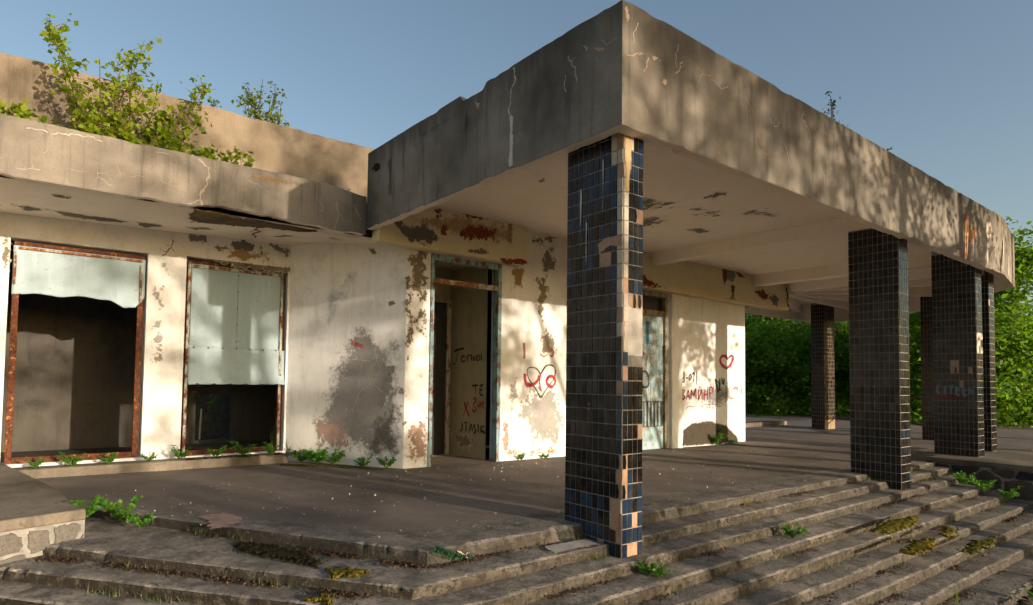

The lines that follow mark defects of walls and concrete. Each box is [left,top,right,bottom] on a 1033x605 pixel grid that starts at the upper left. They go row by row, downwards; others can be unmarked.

crack [508,67,516,132]
crack [0,127,102,170]
peeling [0,194,164,228]
peeling [643,191,727,234]
peeling [598,234,621,254]
rust [964,213,977,258]
spalling [722,269,744,285]
peeling [755,290,779,307]
peeling [307,209,497,465]
peeling [501,377,564,453]
peeling [609,499,620,533]